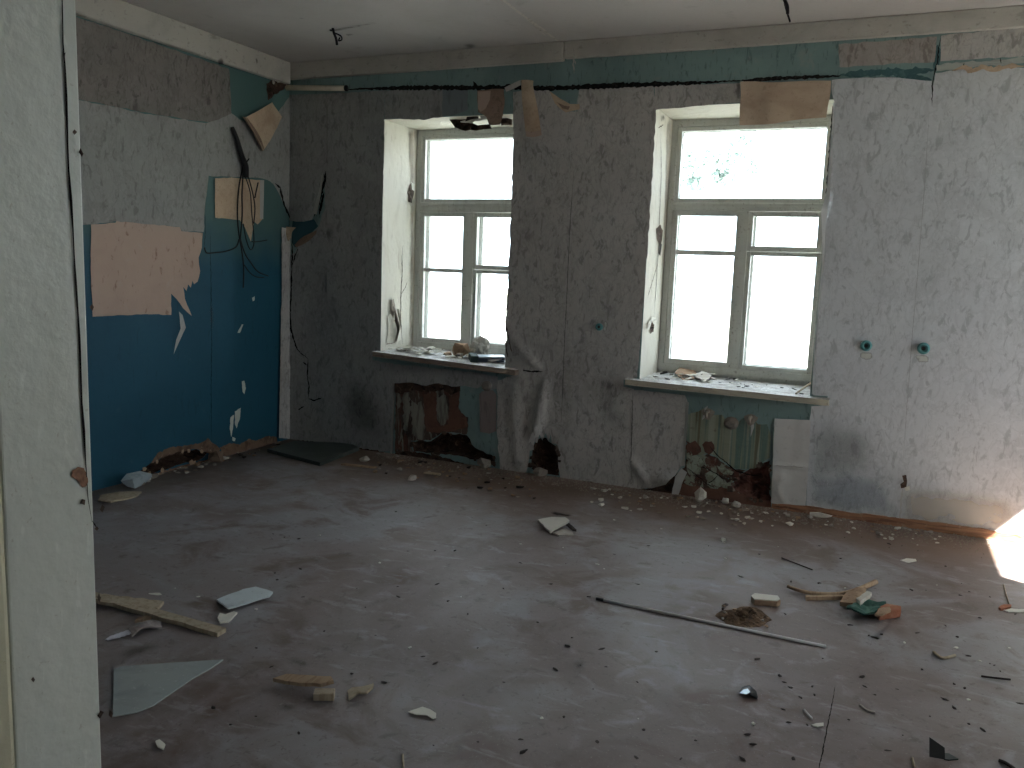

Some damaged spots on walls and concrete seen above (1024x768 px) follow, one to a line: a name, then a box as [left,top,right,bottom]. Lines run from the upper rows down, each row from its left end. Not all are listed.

spalling [266,80,288,100]
crack [349,37,941,100]
peeling [174,312,186,352]
crack [290,246,321,410]
spalling [71,467,88,505]
spalling [141,408,277,474]
spalling [394,382,496,467]
spalling [528,438,561,476]
peeling [645,406,772,508]